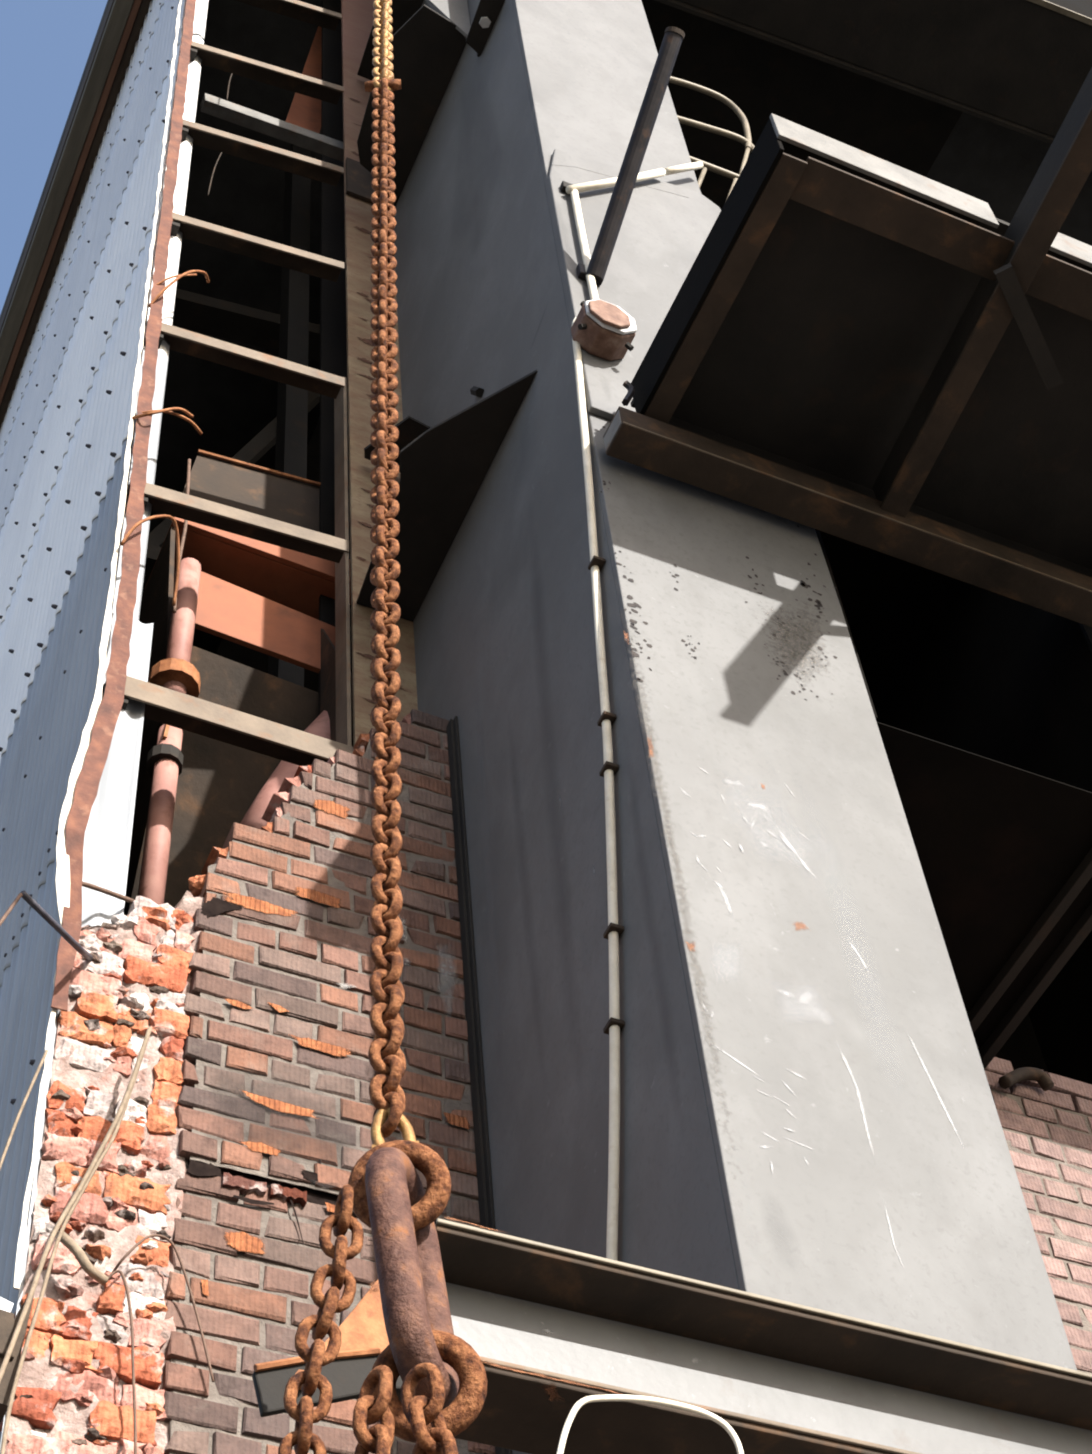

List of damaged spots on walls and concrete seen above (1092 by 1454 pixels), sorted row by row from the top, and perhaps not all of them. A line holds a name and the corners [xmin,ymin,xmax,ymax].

rust [614,551,652,682]
rust [764,553,838,700]
spalling [261,733,370,833]
spalling [225,887,340,916]
spalling [225,999,290,1012]
spalling [291,1035,350,1056]
spalling [242,1090,316,1118]
spalling [0,846,229,1454]
spalling [241,1141,280,1156]
crack [187,1159,373,1244]
spalling [224,1231,265,1254]